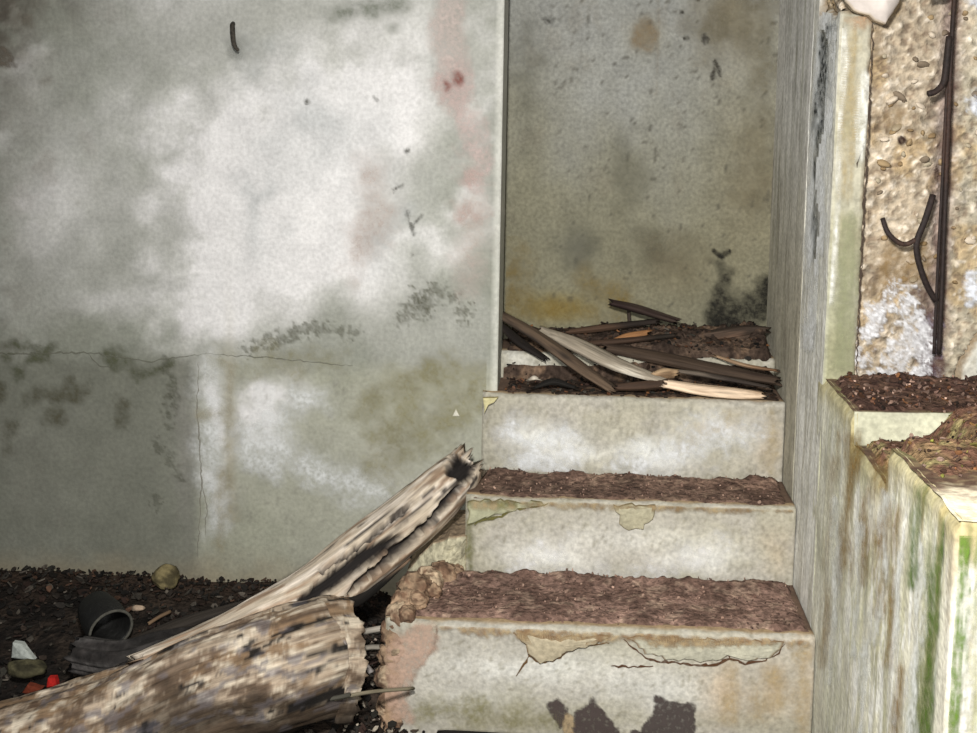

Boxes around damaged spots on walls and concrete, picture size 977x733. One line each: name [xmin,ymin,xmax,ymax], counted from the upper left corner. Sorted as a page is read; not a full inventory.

spalling [826,0,848,13]
leakage [803,12,945,378]
spalling [855,0,977,378]
leakage [242,411,289,472]
leakage [300,457,386,494]
peeling [467,498,752,530]
peeling [385,625,808,721]
crack [514,633,785,676]
leakage [948,536,974,733]
peeling [548,699,619,733]
peeling [631,695,696,733]